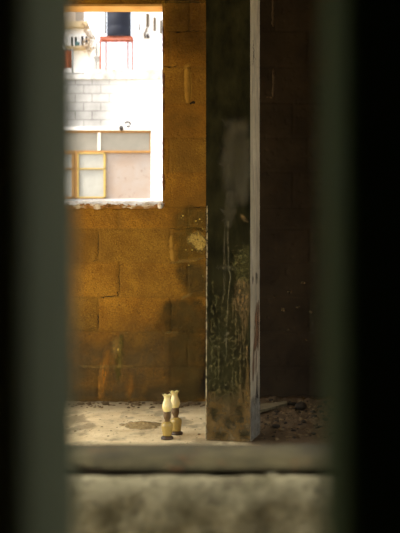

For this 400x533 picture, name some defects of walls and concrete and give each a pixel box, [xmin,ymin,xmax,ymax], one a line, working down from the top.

leakage [75,332,187,402]
leakage [188,0,261,440]